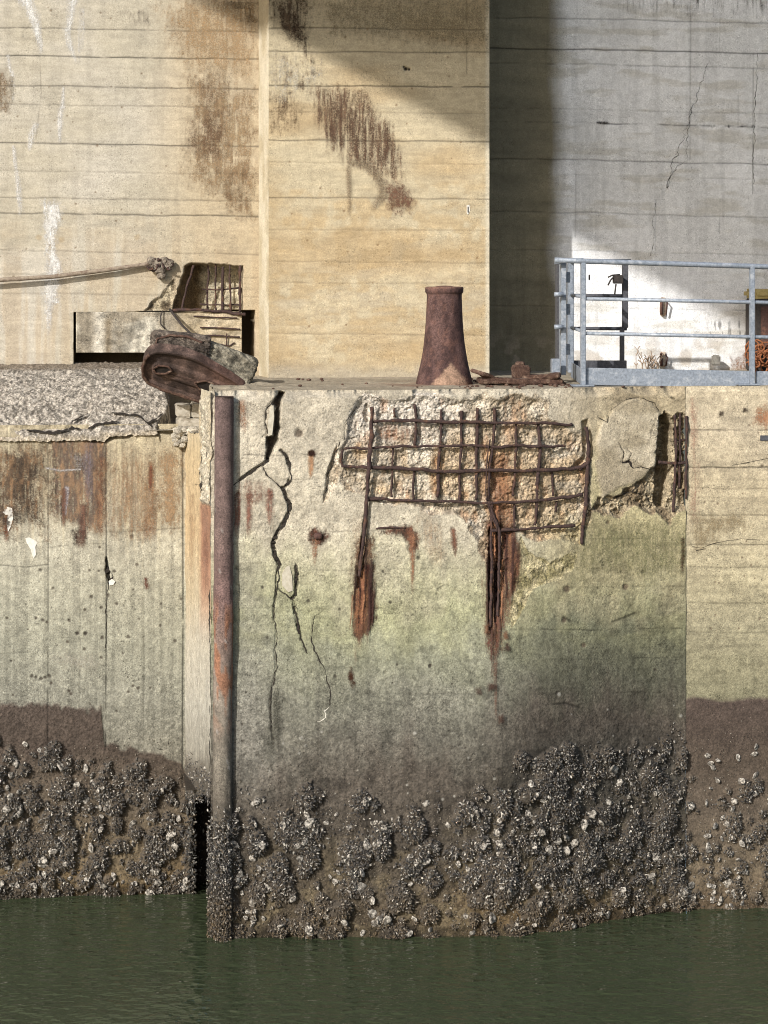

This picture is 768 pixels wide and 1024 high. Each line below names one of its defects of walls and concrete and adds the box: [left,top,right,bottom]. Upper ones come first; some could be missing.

leakage [171,0,311,216]
rust [0,440,156,546]
crack [27,412,163,434]
crack [233,391,331,744]
rust [350,524,432,642]
rust [476,452,520,724]
spalling [322,391,689,628]